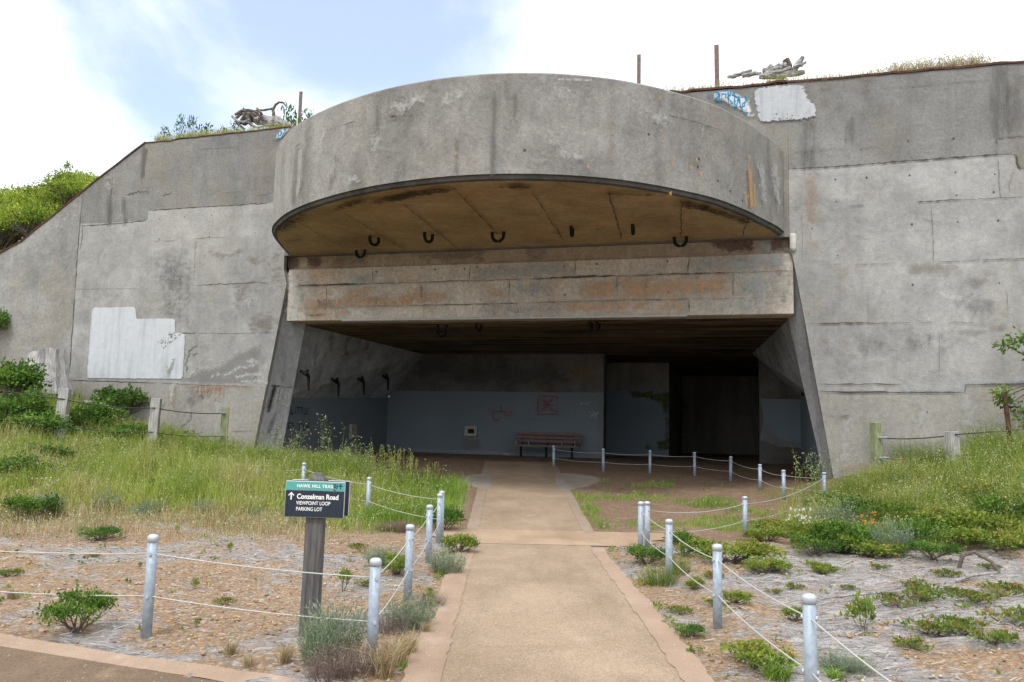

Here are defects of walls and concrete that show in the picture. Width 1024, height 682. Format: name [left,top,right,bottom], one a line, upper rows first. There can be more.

damp [189,359,291,412]